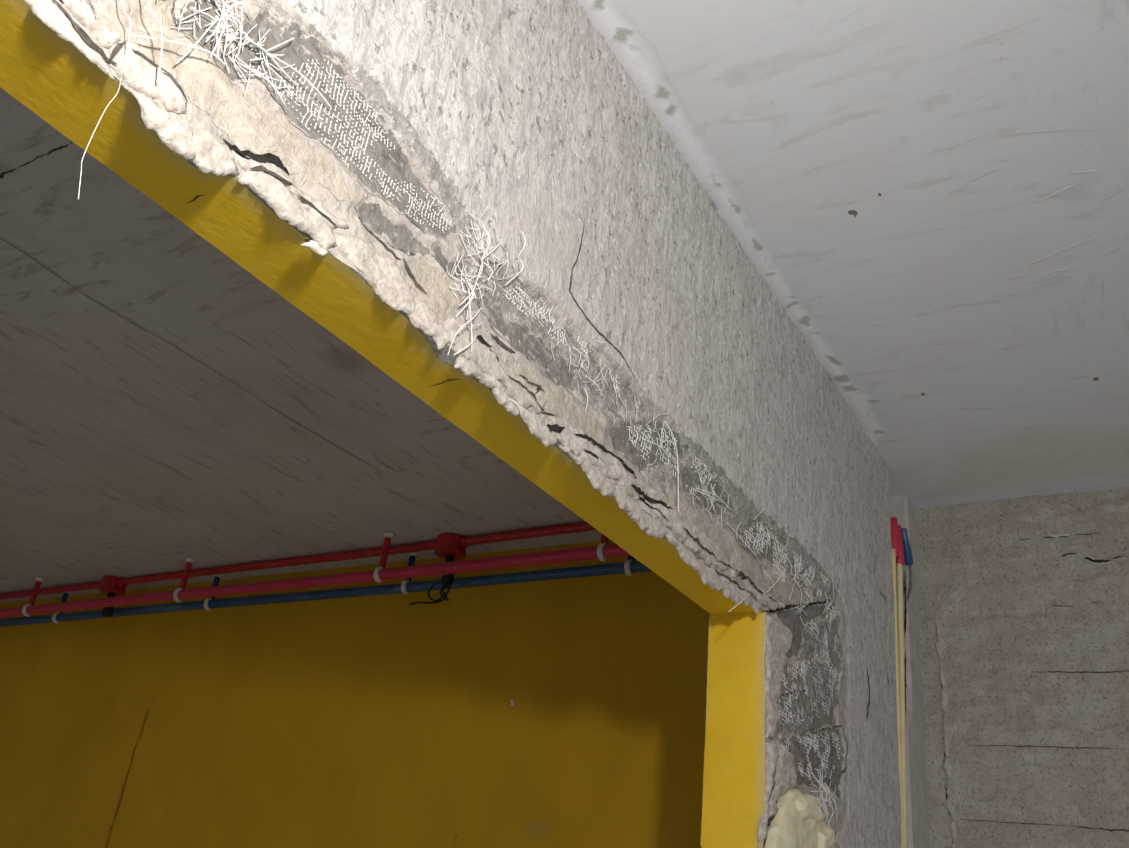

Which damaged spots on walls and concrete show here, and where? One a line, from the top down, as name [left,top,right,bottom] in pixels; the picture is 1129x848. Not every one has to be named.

crack [0,141,72,179]
crack [569,219,641,388]
spalling [25,0,846,848]
crack [1034,668,1129,676]
crack [945,787,1129,843]